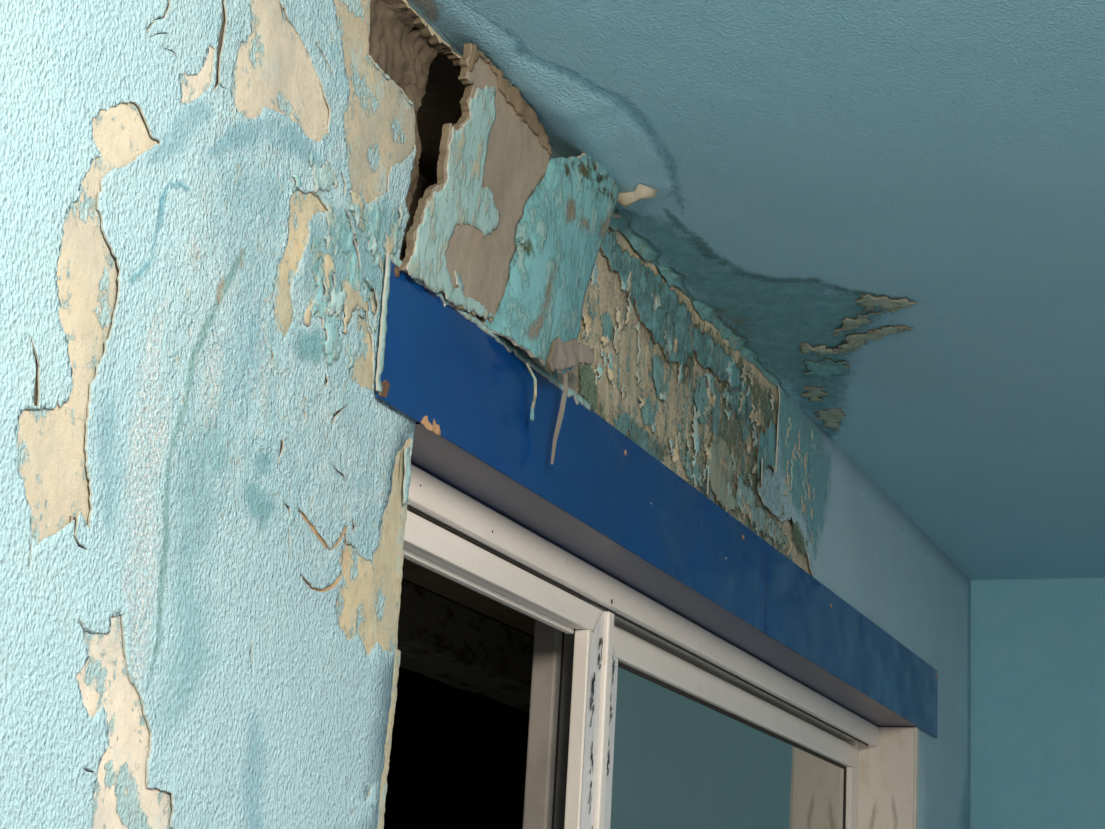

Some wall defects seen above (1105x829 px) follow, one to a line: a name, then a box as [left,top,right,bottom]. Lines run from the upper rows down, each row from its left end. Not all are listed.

peeling [180,46,213,104]
crack [214,0,225,89]
crack [31,350,39,406]
peeling [17,102,159,545]
peeling [225,0,918,576]
leakage [565,161,884,548]
peeling [76,614,172,829]